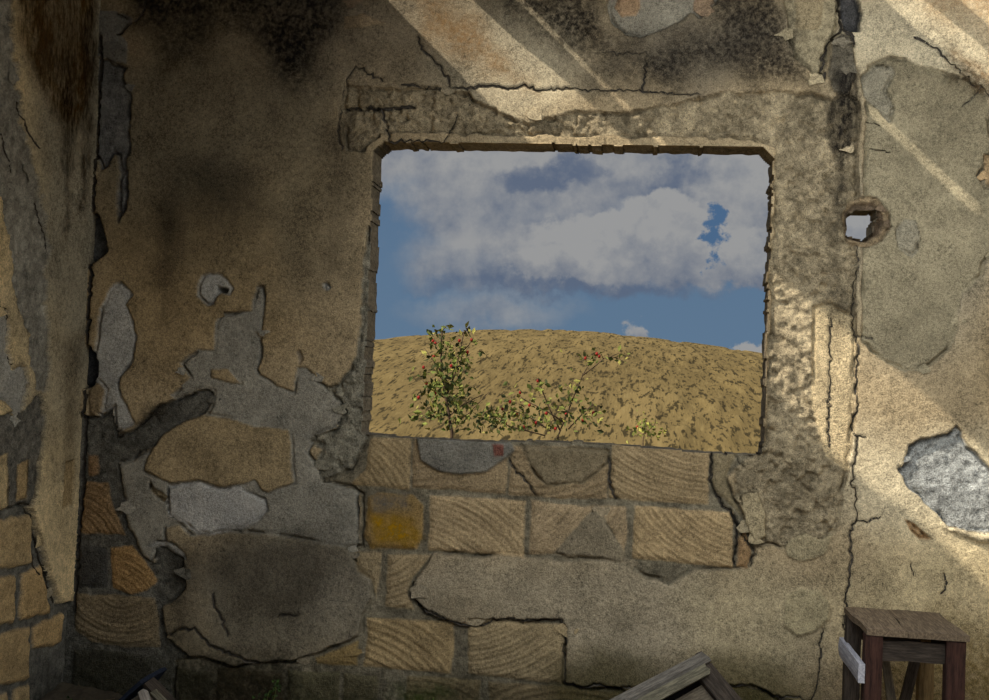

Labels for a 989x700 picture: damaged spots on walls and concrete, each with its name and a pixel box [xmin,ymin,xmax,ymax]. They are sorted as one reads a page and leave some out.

damp [138,0,343,72]
crack [337,36,700,149]
flaking render [606,0,718,38]
flaking render [0,0,371,700]
flaking render [172,55,989,700]
crack [730,245,880,700]